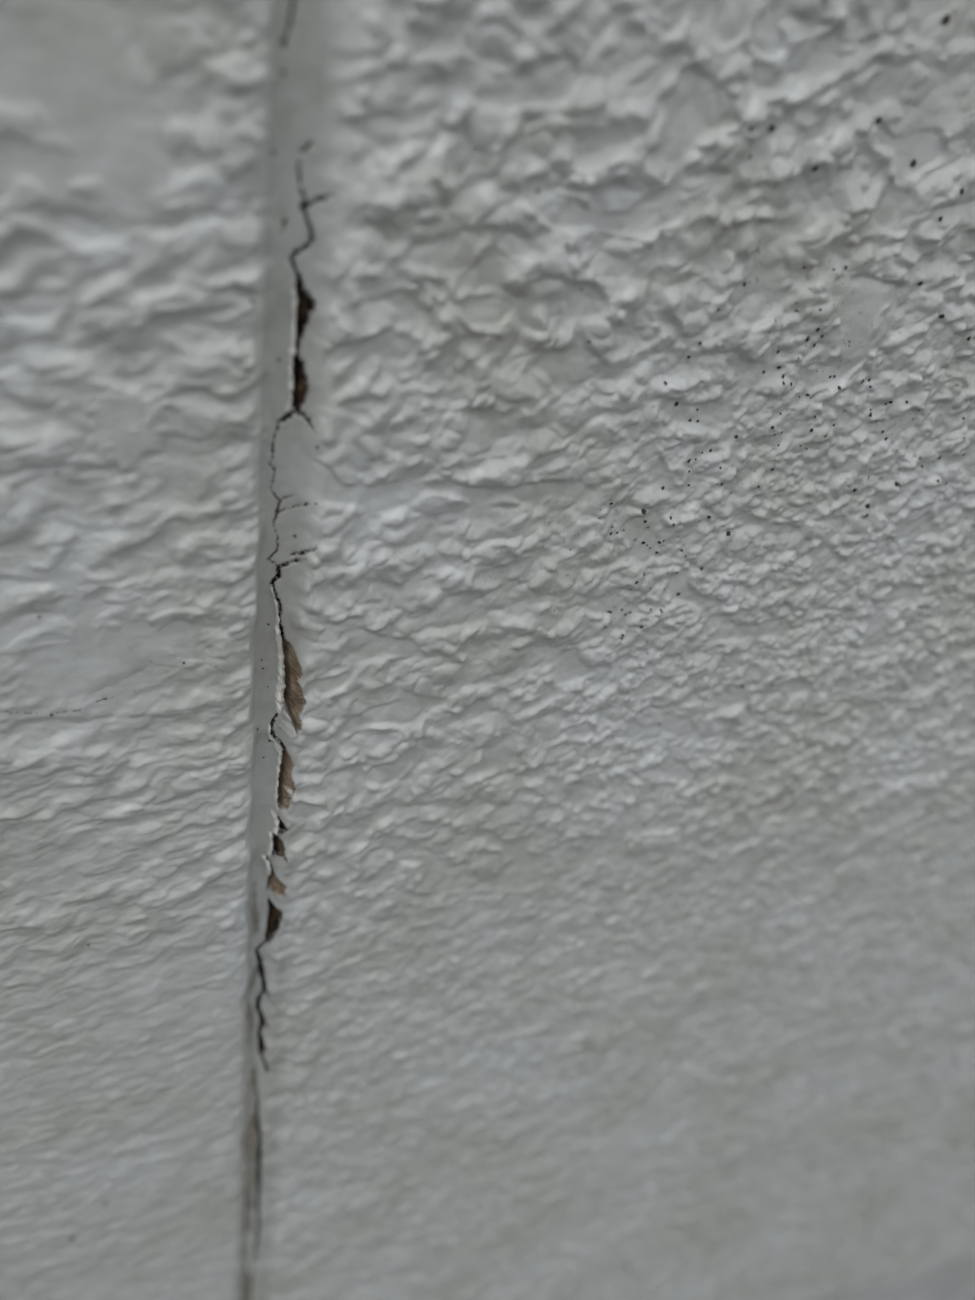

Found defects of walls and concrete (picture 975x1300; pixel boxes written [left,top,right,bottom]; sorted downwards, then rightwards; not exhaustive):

crack [268,141,331,642]
crack [267,713,283,750]
peeling [261,635,306,943]